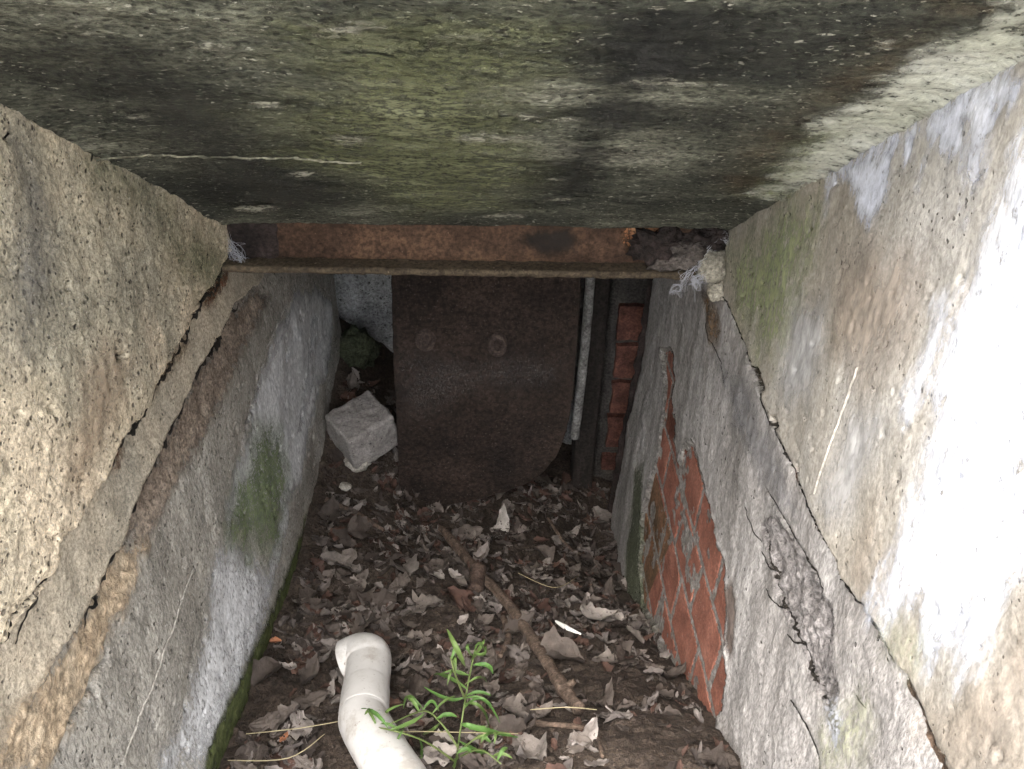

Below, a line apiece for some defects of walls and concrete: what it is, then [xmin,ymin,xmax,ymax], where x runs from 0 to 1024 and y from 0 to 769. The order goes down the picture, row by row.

leakage [45,48,341,212]
leakage [751,0,1024,221]
corrosion [227,223,279,259]
corrosion [522,229,576,256]
crack [113,267,239,513]
leakage [885,163,1024,661]
crack [5,578,47,644]
crack [83,551,117,630]
leakage [160,287,332,769]
flaking render [638,347,727,728]
flaking render [760,515,839,714]
crack [722,297,948,769]